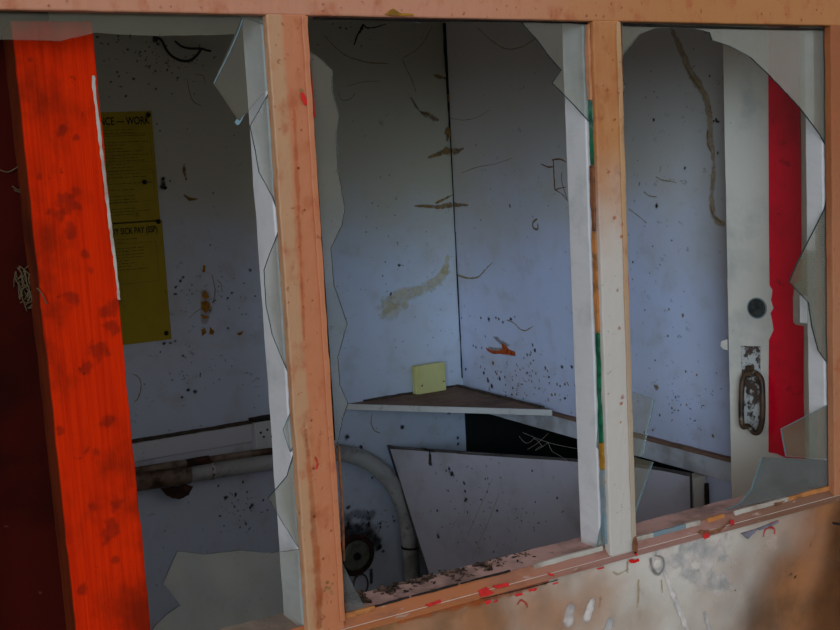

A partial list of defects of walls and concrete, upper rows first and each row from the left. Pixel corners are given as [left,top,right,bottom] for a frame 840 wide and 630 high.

crack [318,23,511,378]
crack [629,166,686,223]
rust [475,343,524,359]